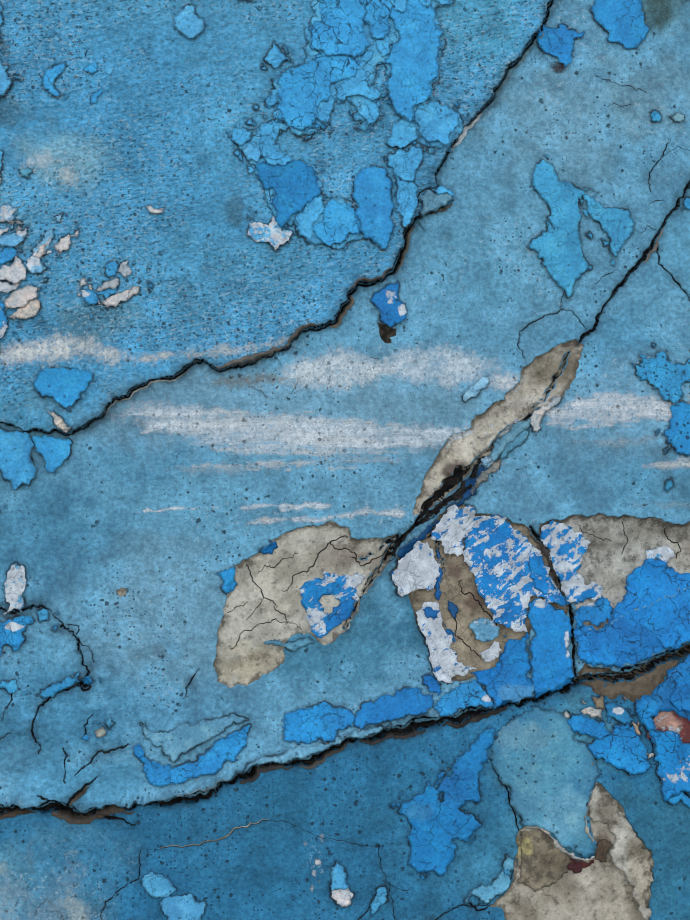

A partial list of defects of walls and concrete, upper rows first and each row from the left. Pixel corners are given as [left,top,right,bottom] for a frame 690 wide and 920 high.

peeling [0,39,22,97]
peeling [42,62,66,96]
peeling [77,261,153,319]
crack [0,0,553,436]
peeling [226,0,463,250]
crack [343,139,690,627]
crack [0,526,690,831]
flaking render [134,339,690,920]
crack [100,819,411,920]
crack [435,901,490,920]